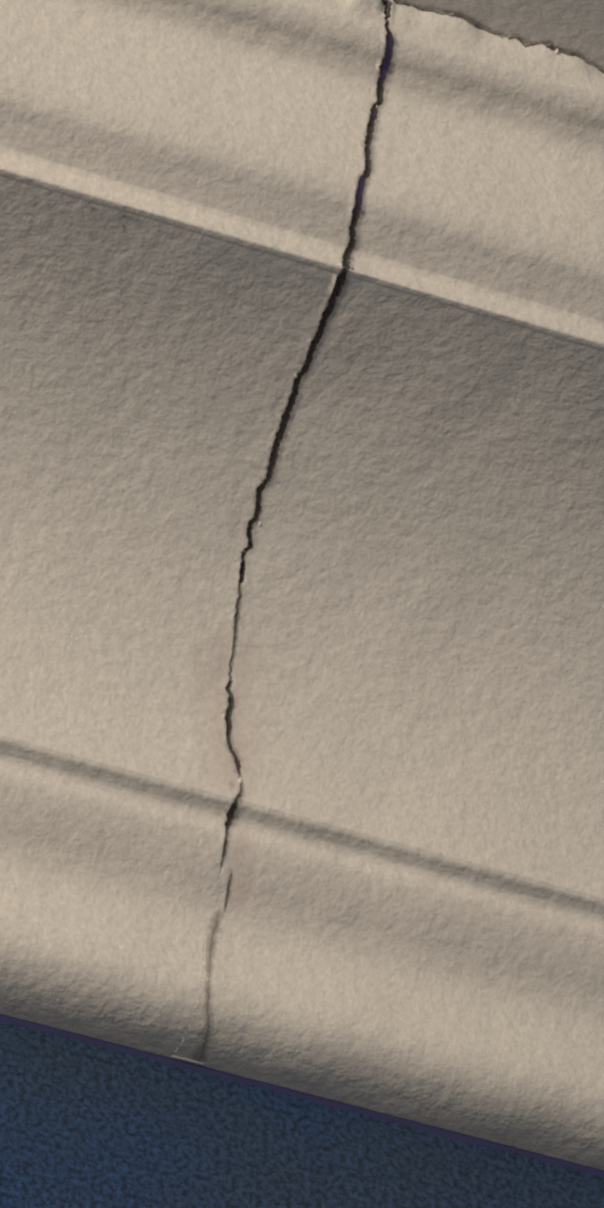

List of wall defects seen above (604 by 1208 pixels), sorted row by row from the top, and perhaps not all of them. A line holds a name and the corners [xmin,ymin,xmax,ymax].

crack [171,0,604,1065]